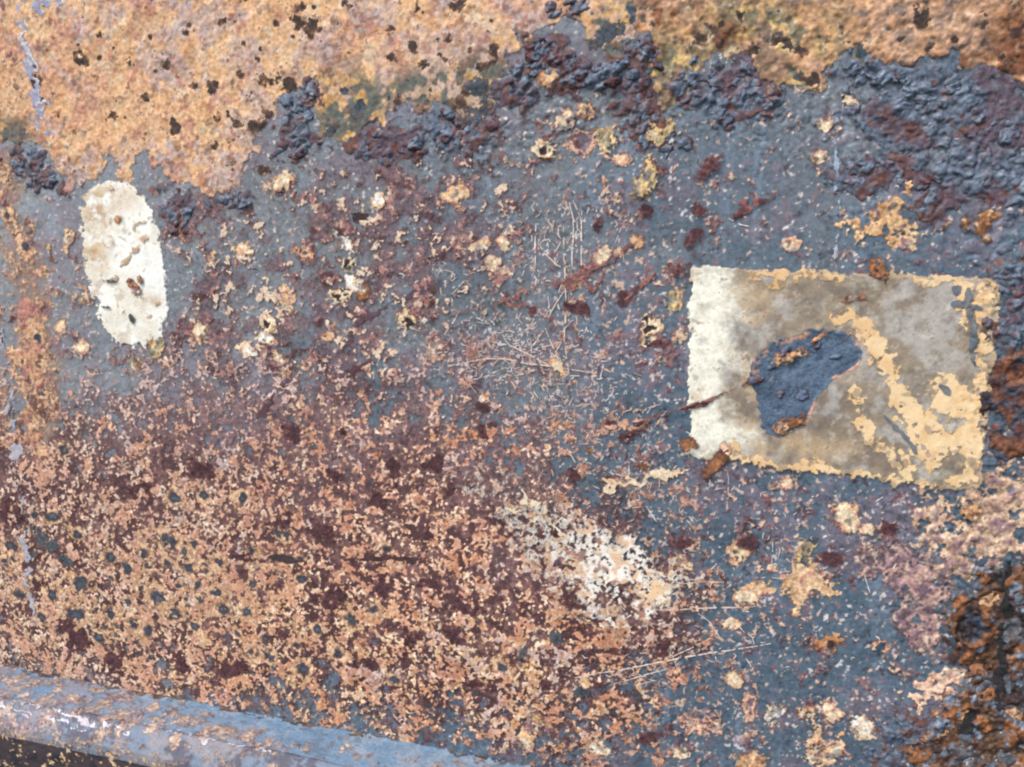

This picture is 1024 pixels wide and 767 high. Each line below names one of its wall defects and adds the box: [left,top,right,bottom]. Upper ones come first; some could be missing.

rust [574,0,1024,147]
rust [0,0,758,767]
peeling [747,328,862,438]
rust [720,347,1024,767]